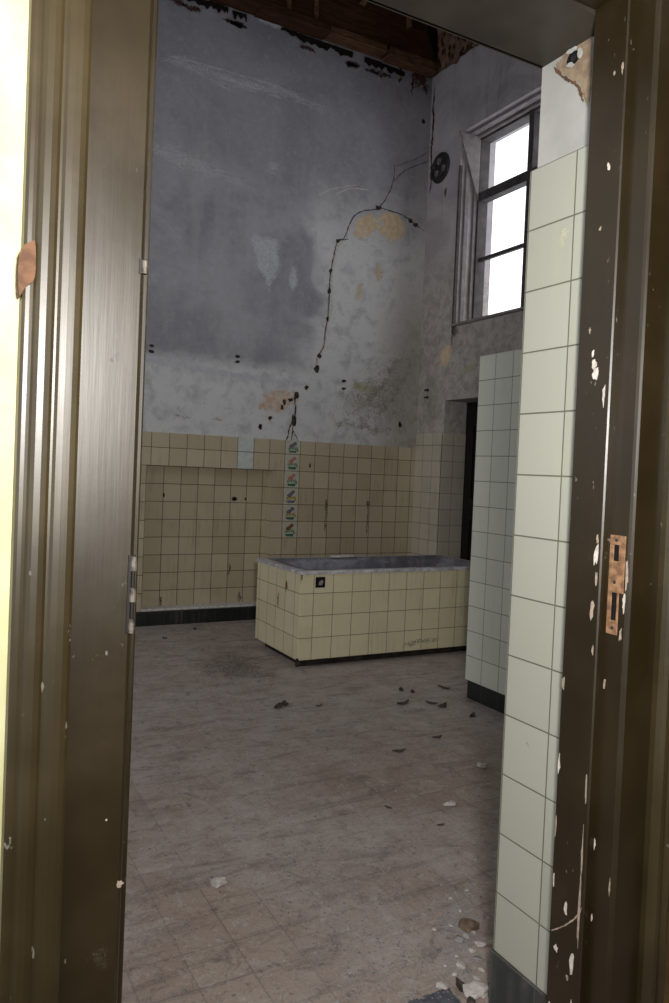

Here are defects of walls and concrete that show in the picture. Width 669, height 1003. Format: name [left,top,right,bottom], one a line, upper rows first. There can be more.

flaking render [171,0,406,78]
flaking render [554,37,593,106]
crack [314,87,435,373]
peeling [257,385,309,420]
crack [286,394,298,440]
peeling [592,350,605,408]
peeling [564,824,596,981]